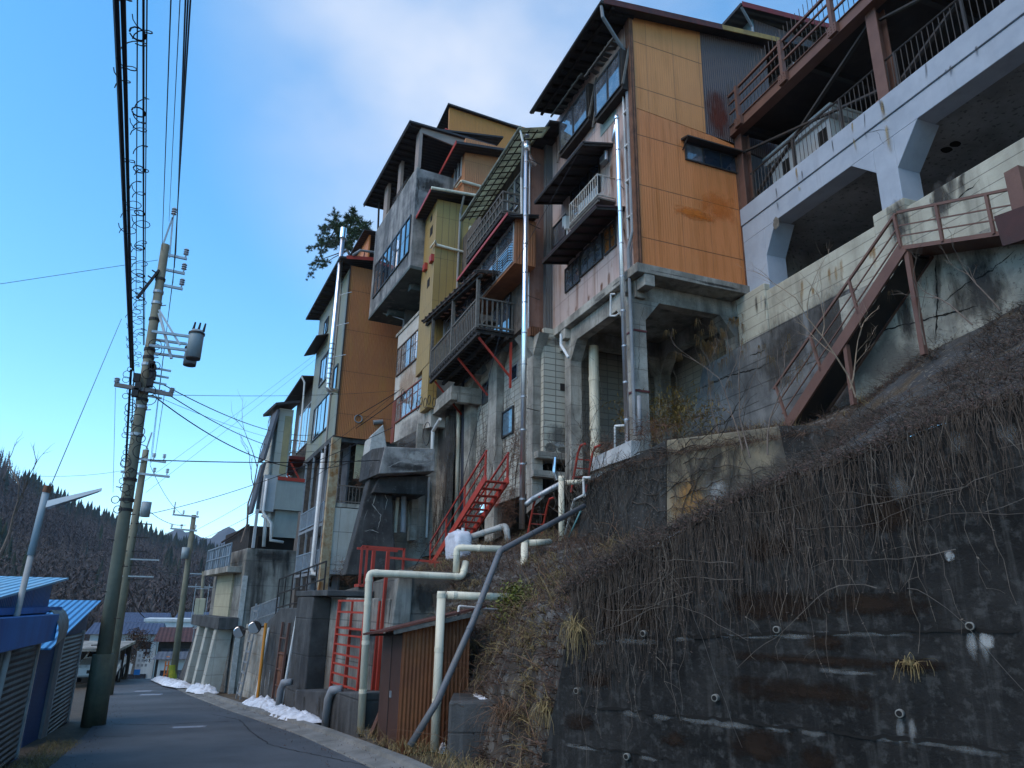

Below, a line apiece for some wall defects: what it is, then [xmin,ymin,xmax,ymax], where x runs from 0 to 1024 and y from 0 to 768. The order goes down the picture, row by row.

crack [884,252,1013,334]